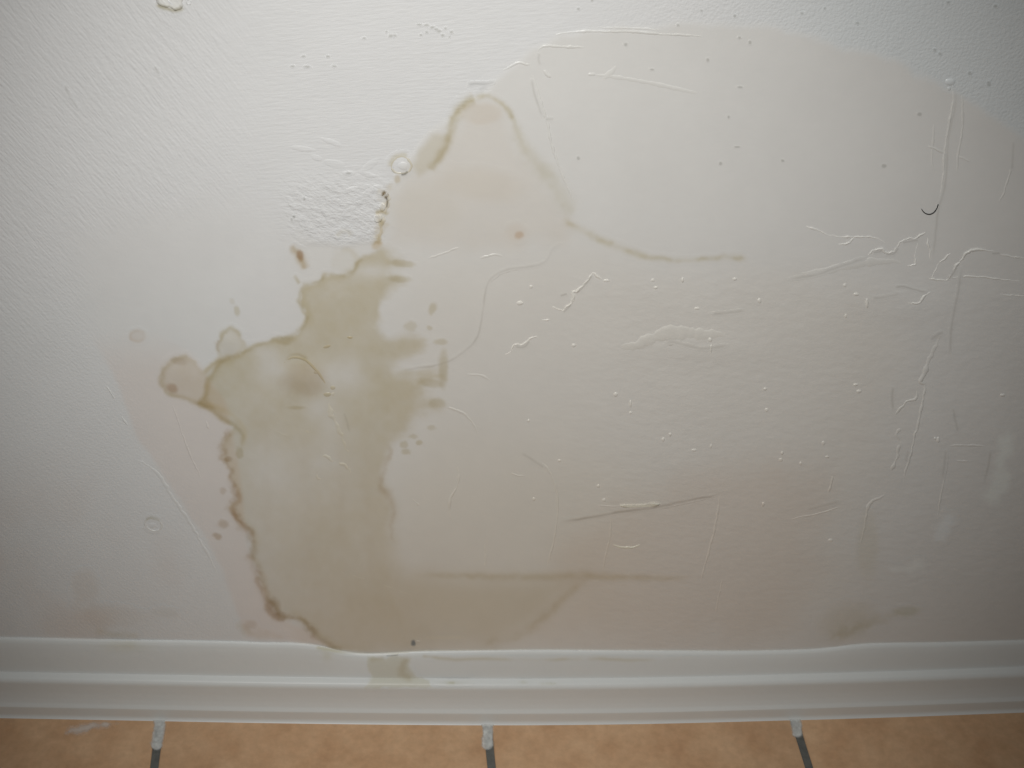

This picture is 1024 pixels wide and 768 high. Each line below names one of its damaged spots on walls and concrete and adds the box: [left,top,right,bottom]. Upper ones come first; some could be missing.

crack [505,273,602,355]
damp [391,89,750,267]
crack [806,226,1024,305]
damp [155,242,700,666]